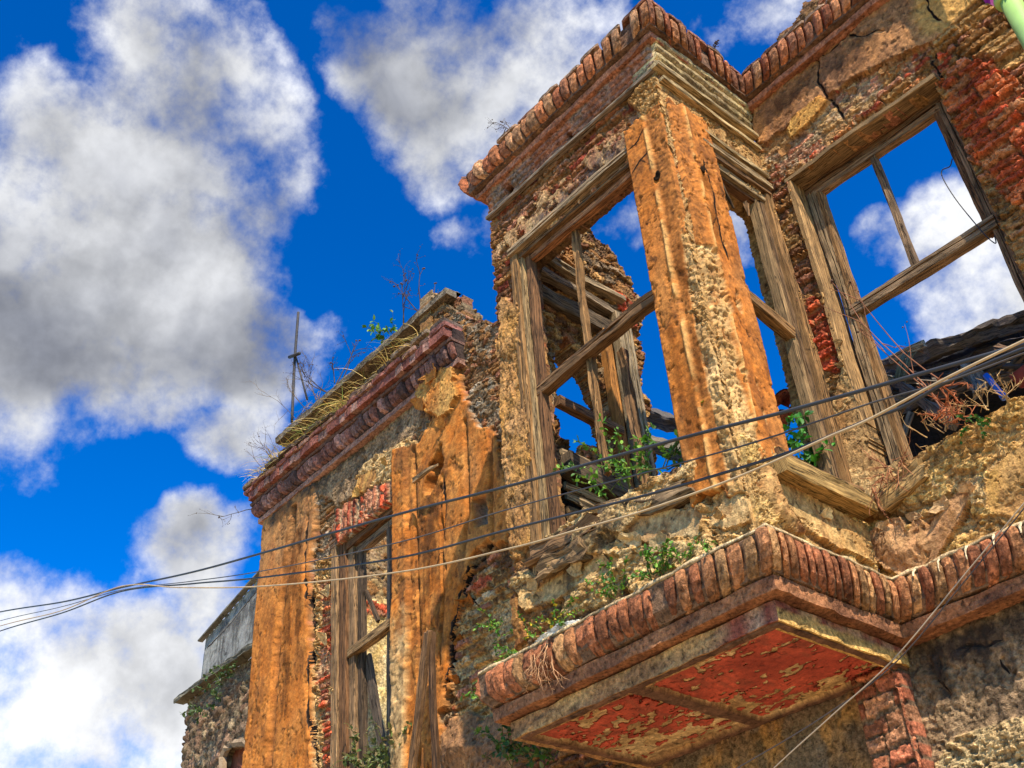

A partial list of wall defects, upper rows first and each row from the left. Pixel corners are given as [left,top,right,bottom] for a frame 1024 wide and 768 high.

crack [926,0,941,21]
crack [817,29,882,121]
crack [930,53,944,84]
spalling [761,40,1024,212]
spalling [805,296,844,374]
peeling [540,630,883,758]